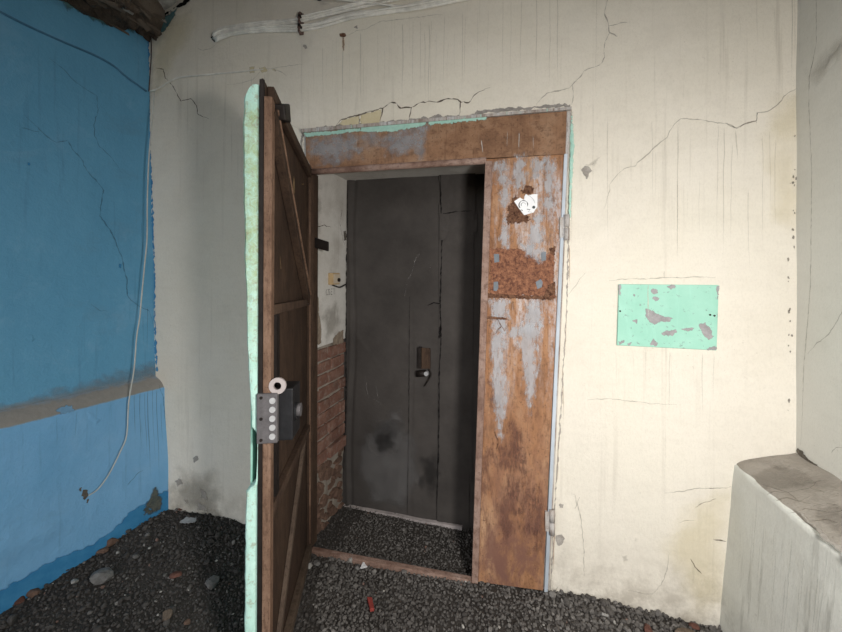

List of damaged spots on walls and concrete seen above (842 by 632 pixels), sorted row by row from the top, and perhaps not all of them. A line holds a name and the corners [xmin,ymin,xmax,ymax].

crack [336,89,485,126]
peeling [300,103,591,217]
rust [506,185,536,225]
peeling [522,216,544,260]
rust [488,247,556,300]
peeling [492,300,542,435]
spalling [554,240,569,510]
flaking render [550,535,565,589]